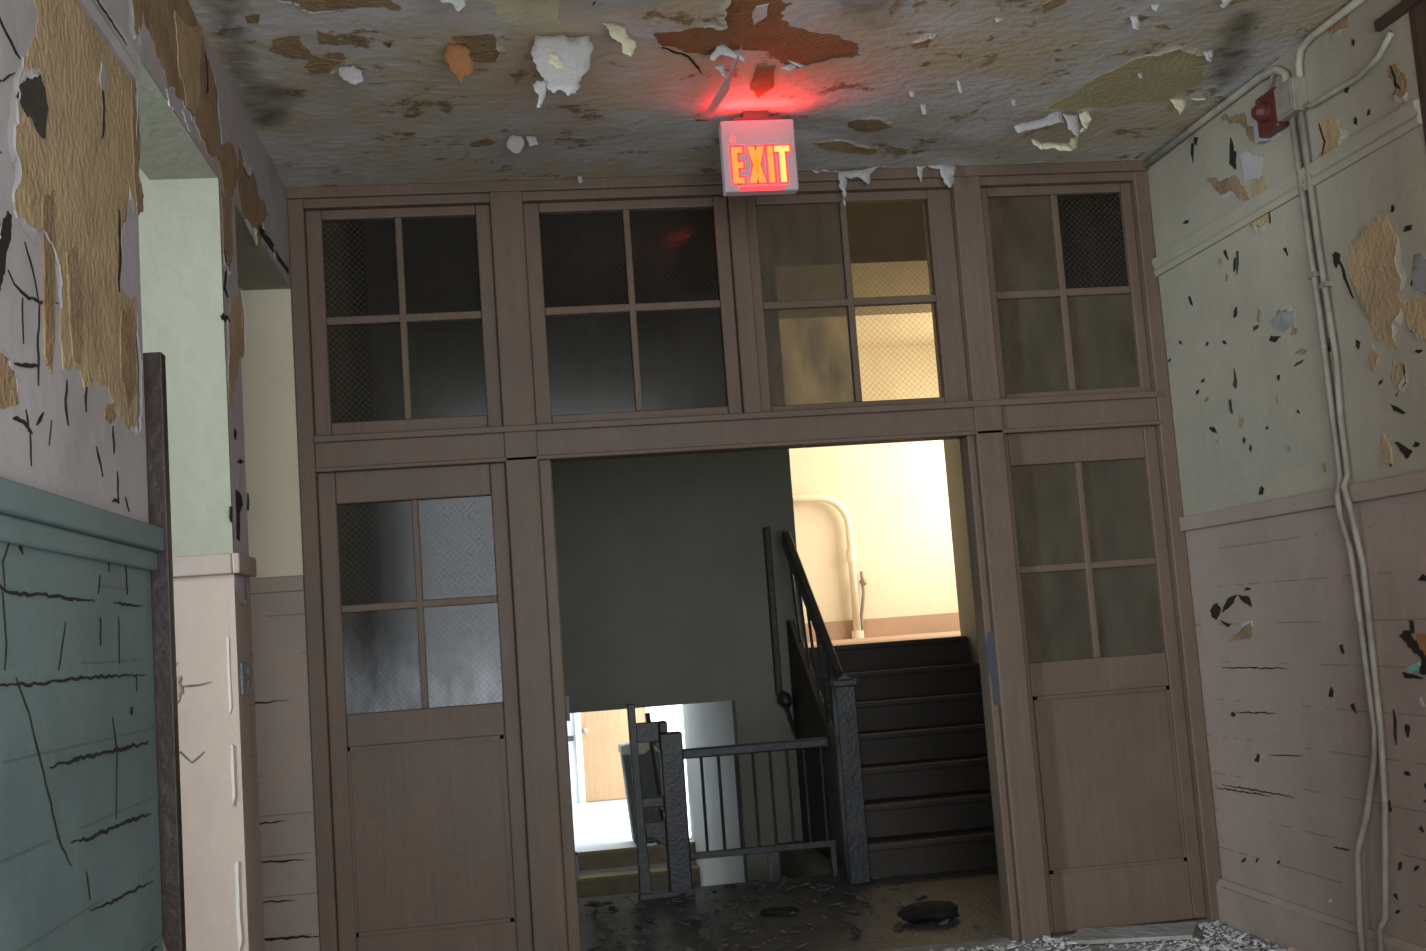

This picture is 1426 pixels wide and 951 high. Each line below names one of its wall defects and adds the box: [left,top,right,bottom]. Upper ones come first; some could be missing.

crack [0,17,21,82]
peeling [268,0,402,85]
peeling [531,34,593,108]
peeling [602,22,637,57]
peeling [653,0,863,121]
peeling [7,0,144,437]
peeling [128,0,289,408]
crack [0,211,130,512]
peeling [1332,205,1426,414]
peeling [229,489,249,542]
peeling [1210,587,1253,641]
crack [0,543,202,911]